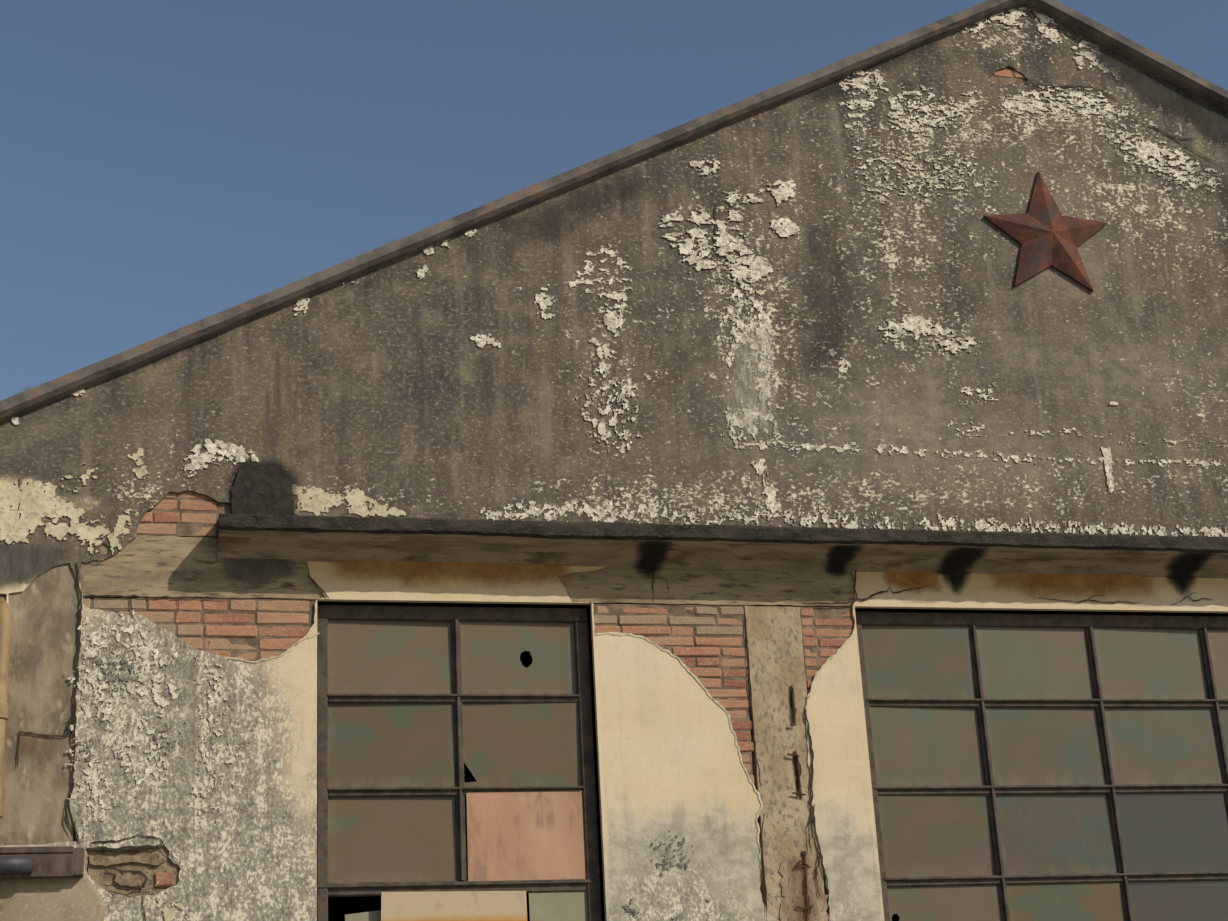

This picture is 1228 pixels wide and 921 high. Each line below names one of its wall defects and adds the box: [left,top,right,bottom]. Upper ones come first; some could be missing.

peeling [990,68,1224,194]
peeling [478,178,1228,537]
peeling [0,439,259,561]
leakage [230,461,294,515]
leakage [827,545,861,575]
leakage [940,548,984,591]
crack [1038,595,1139,603]
leakage [1169,553,1212,593]
flaking render [63,598,319,921]
flaking render [593,604,763,861]
crack [745,615,767,920]
crack [805,709,828,898]